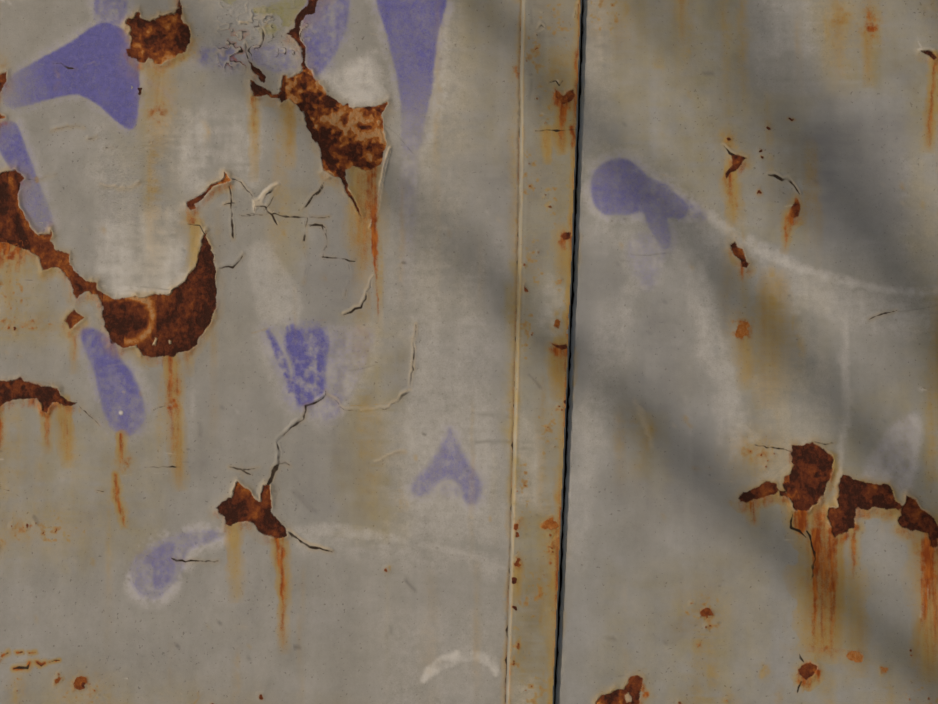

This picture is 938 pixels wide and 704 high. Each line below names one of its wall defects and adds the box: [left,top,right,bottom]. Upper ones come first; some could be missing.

corrosion [0,0,396,532]
crack [219,174,378,320]
crack [224,319,422,491]
corrosion [498,0,663,704]
corrosion [714,231,938,699]